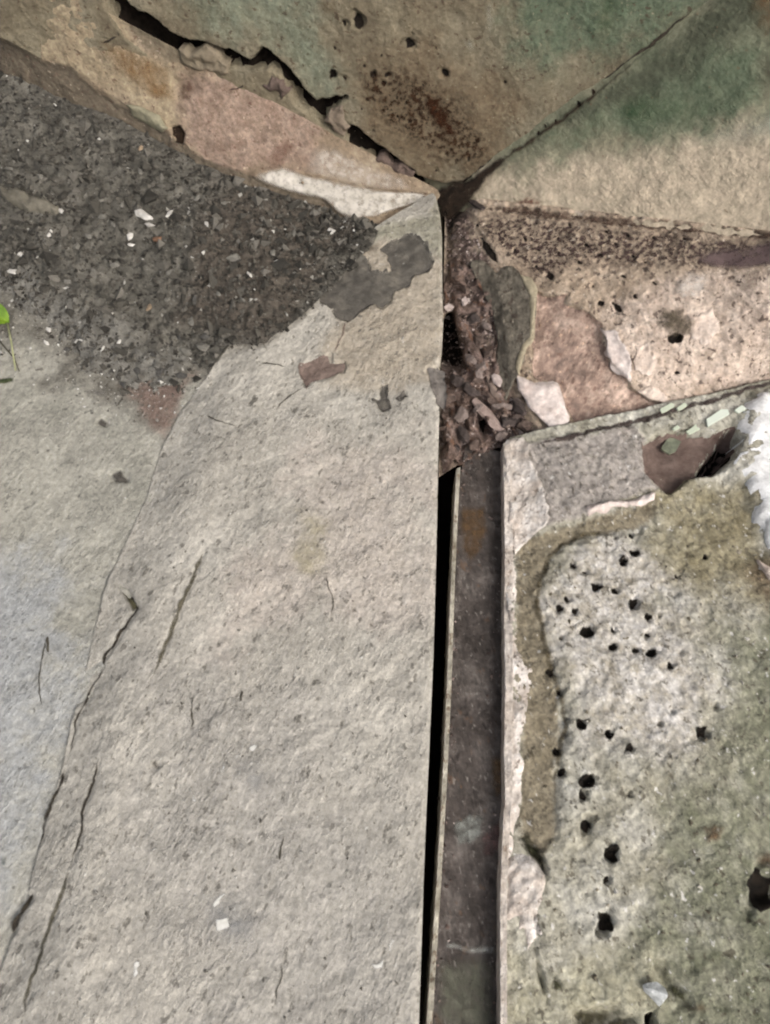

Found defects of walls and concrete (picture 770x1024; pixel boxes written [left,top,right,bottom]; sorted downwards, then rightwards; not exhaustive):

crack [103,0,346,115]
crack [347,125,429,184]
rust [366,74,486,163]
crack [464,15,687,181]
crack [38,637,49,703]
crack [71,595,138,749]
crack [155,556,202,670]
crack [41,774,64,841]
crack [73,765,98,854]
crack [11,878,66,1007]